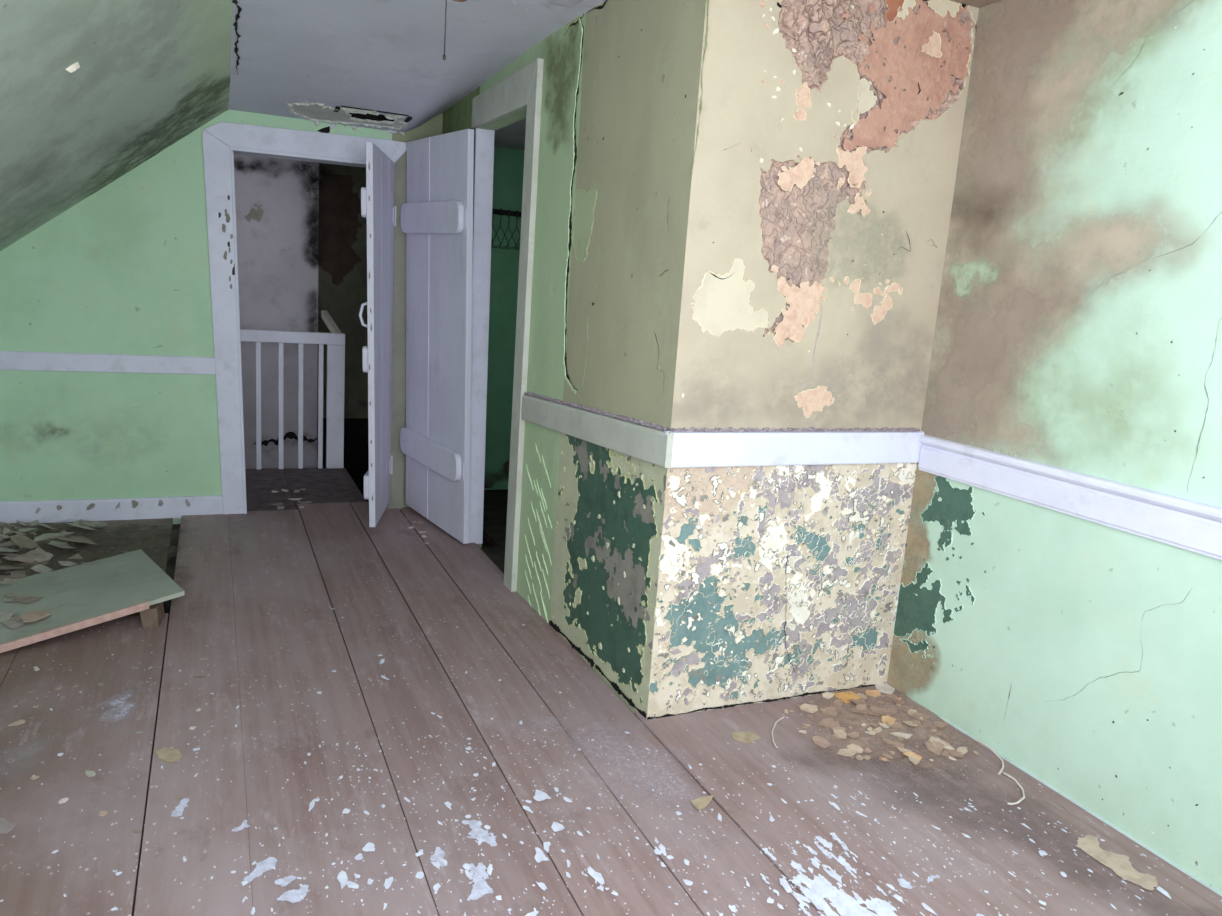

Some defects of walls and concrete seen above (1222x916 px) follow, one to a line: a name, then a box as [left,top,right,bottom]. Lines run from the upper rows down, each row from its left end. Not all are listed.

crack [232,0,242,75]
water stain [546,24,577,128]
water stain [235,160,277,176]
water stain [293,161,333,266]
spalling [691,0,977,352]
water stain [921,0,1174,453]
crack [1154,212,1222,258]
crack [1187,317,1222,492]
peeling [551,434,986,719]
crack [1047,590,1191,702]